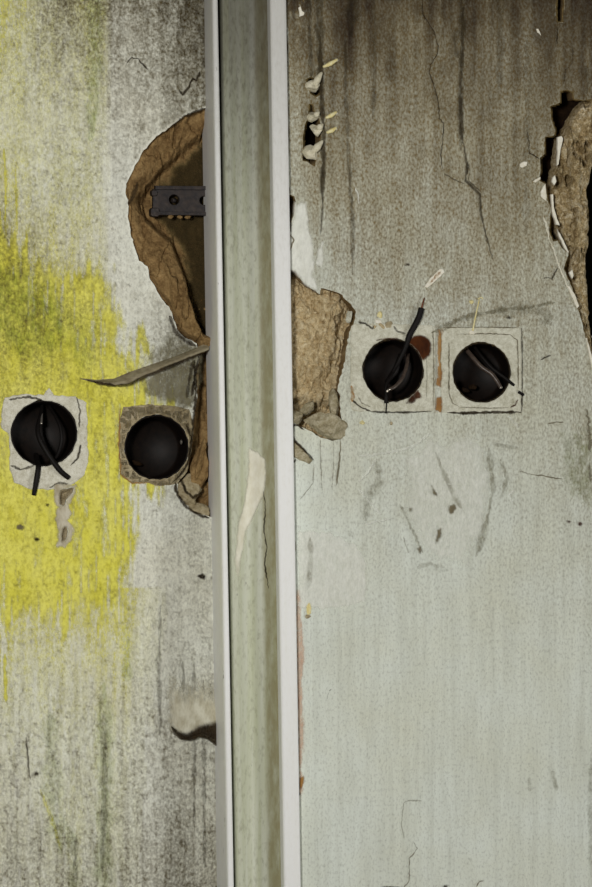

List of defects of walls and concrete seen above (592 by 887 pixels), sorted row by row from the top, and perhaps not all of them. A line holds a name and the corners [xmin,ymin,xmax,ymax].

peeling [0,108,211,702]
spalling [302,120,315,163]
water stain [309,8,326,221]
flaking render [290,203,406,464]
corrosion [410,330,442,386]
crack [422,0,493,259]
water stain [454,7,465,143]
flaking render [533,99,592,369]